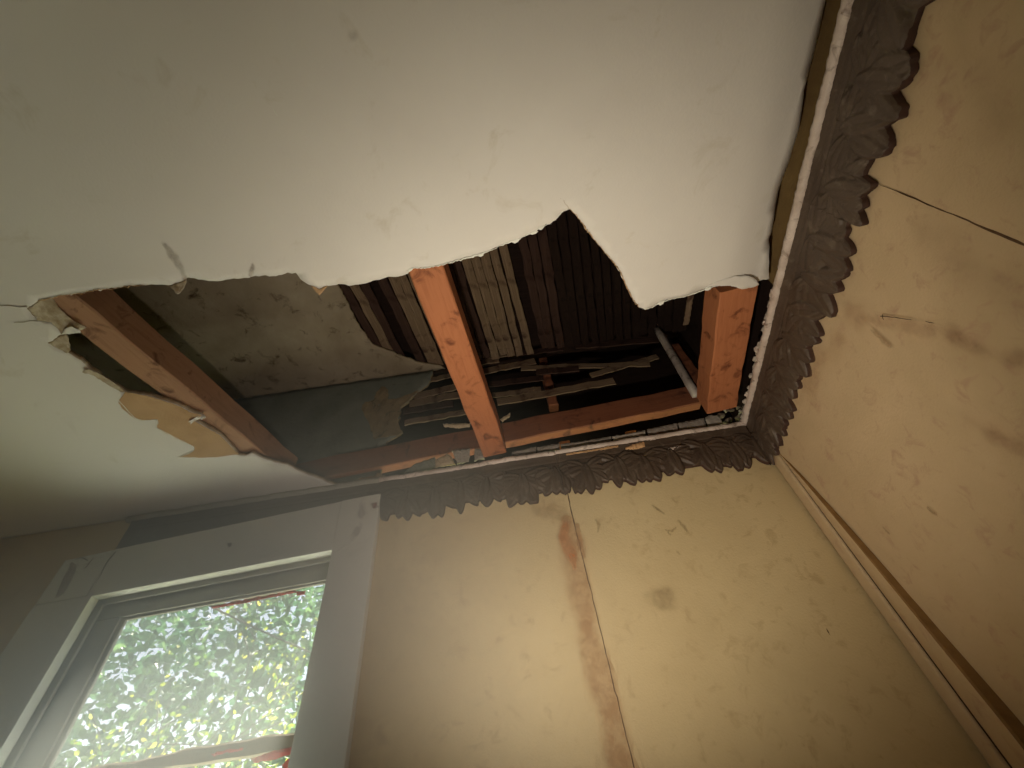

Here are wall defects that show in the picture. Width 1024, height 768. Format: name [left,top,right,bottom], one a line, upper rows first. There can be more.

peeling [169,279,187,294]
spalling [407,209,716,310]
spalling [740,289,773,421]
peeling [118,392,238,458]
spalling [403,449,485,474]
spalling [512,415,723,456]
crack [567,493,635,768]